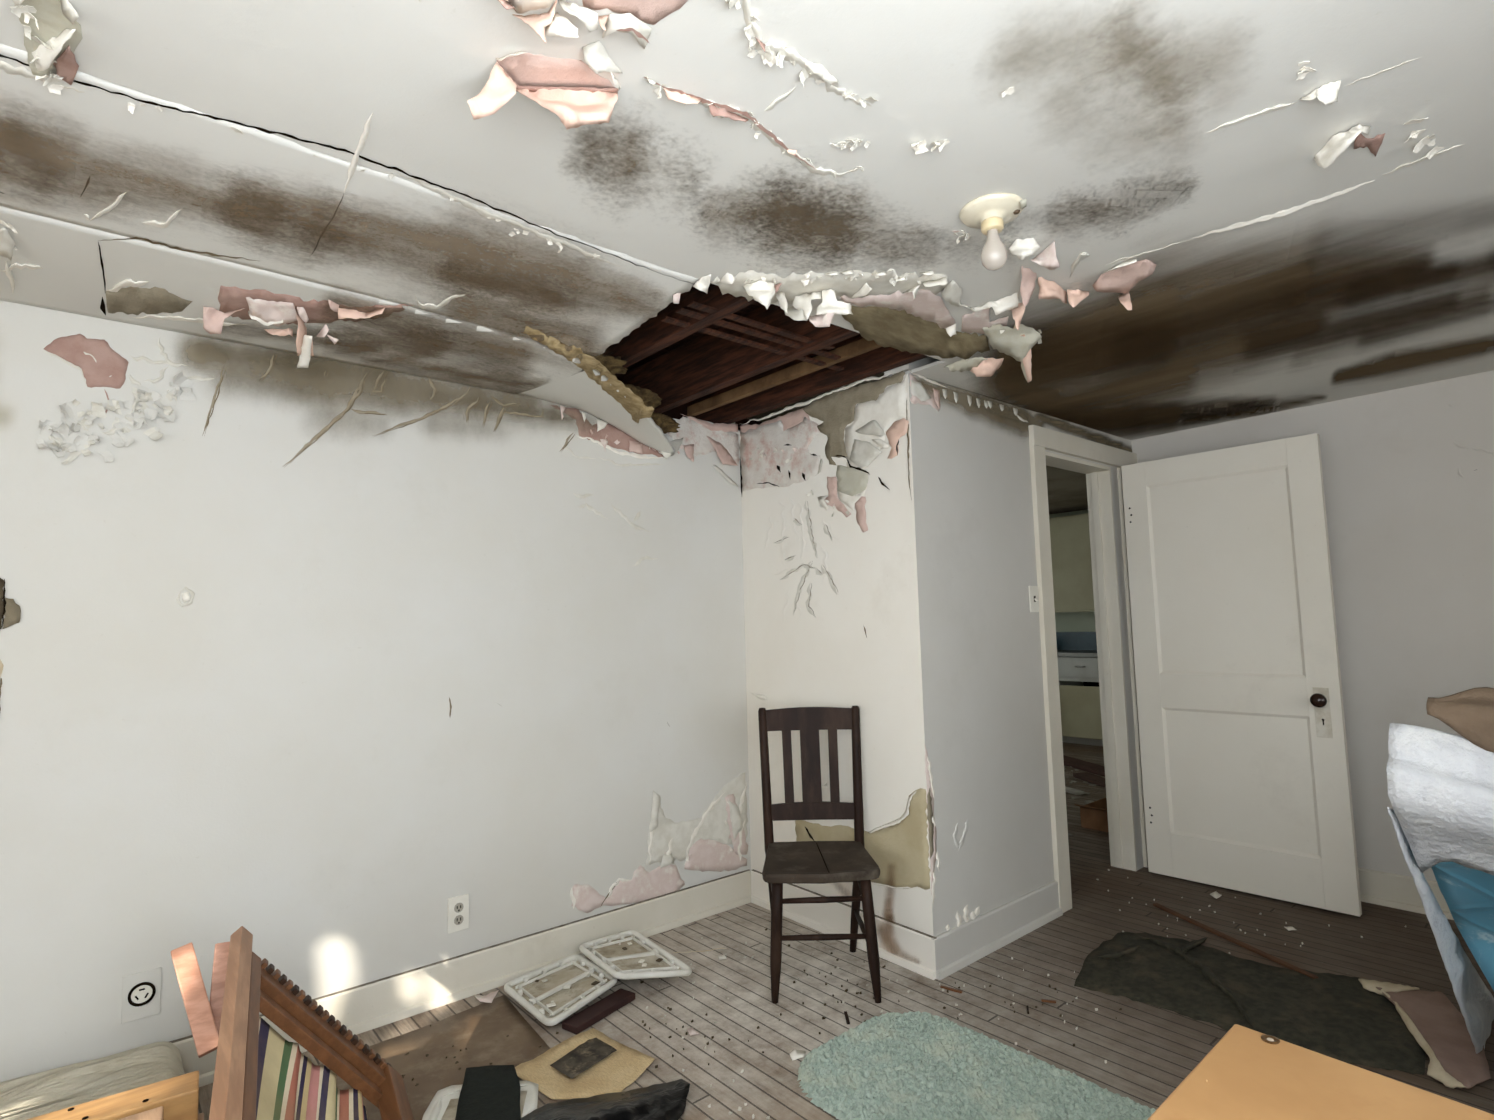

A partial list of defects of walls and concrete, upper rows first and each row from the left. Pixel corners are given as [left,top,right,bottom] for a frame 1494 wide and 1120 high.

peeling [10,0,82,85]
peeling [467,0,688,130]
peeling [643,76,864,179]
peeling [98,237,466,368]
leakage [0,119,656,421]
leakage [701,181,925,266]
peeling [524,118,1464,532]
leakage [1052,184,1188,225]
leakage [917,248,1494,452]
flaking render [0,578,21,630]
crack [763,494,840,624]
peeling [795,746,940,905]